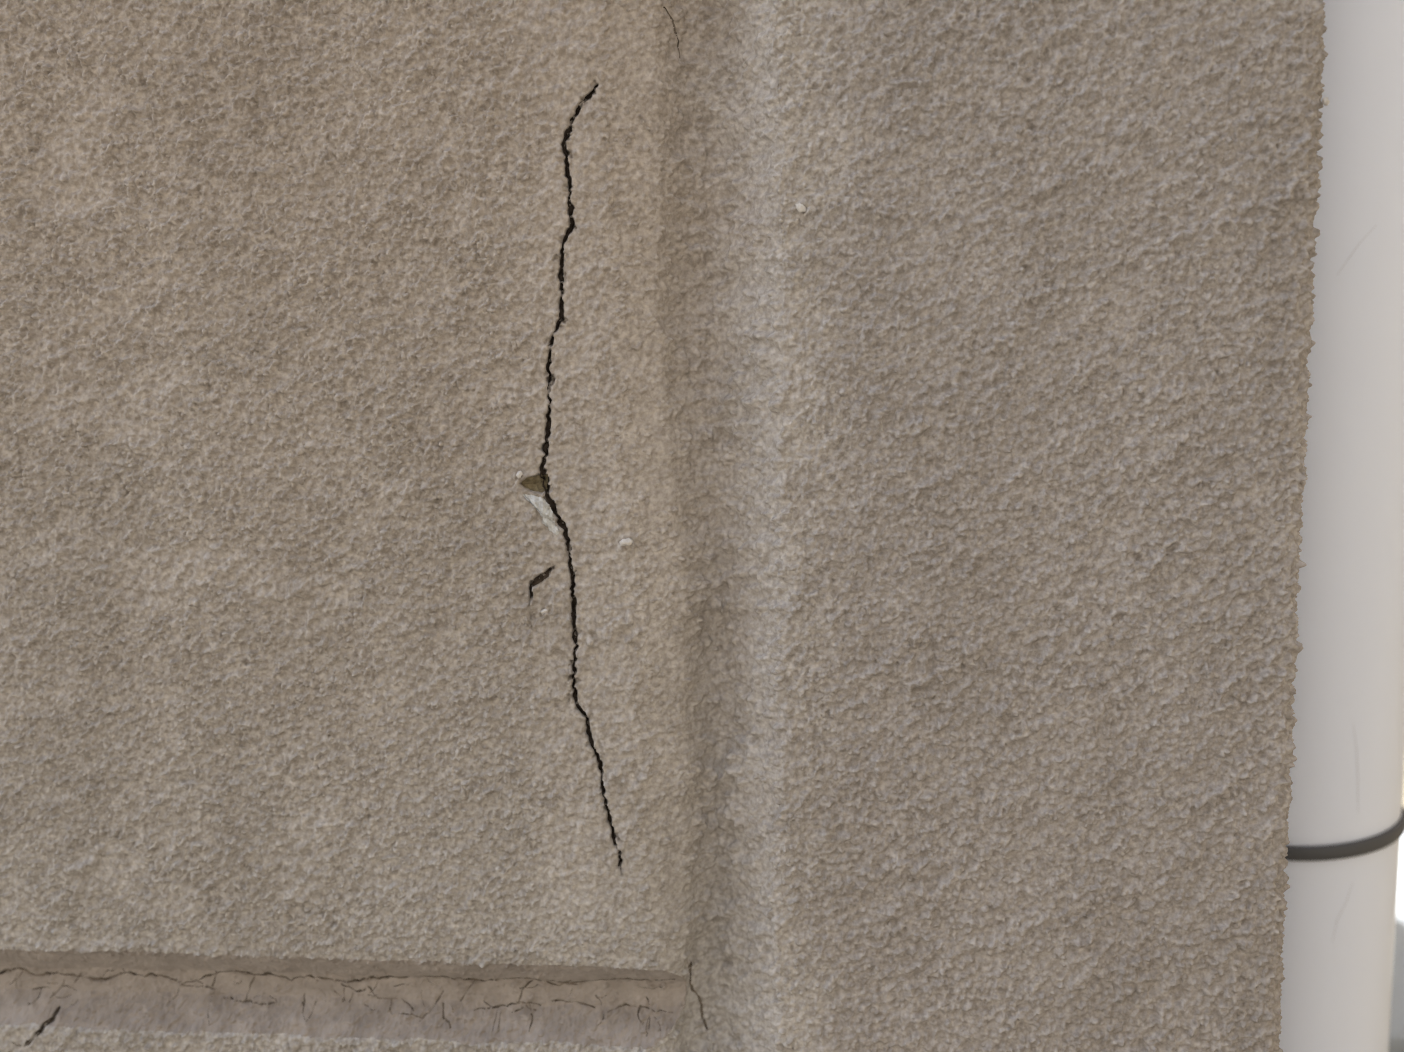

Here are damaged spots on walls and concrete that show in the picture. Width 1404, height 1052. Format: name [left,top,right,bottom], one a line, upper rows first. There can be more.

crack [540,84,623,870]